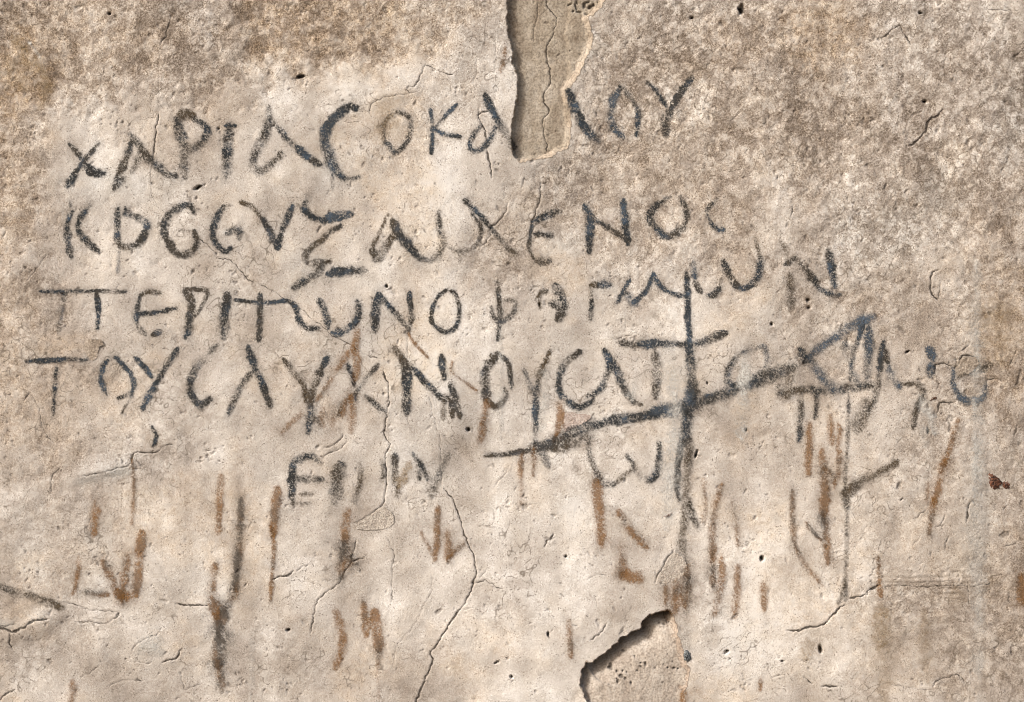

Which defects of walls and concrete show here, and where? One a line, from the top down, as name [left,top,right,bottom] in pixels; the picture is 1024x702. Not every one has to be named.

flaking render [506,0,606,163]
crack [200,239,391,512]
crack [88,444,172,476]
crack [311,542,363,631]
crack [416,479,499,702]
flaking render [580,609,690,702]